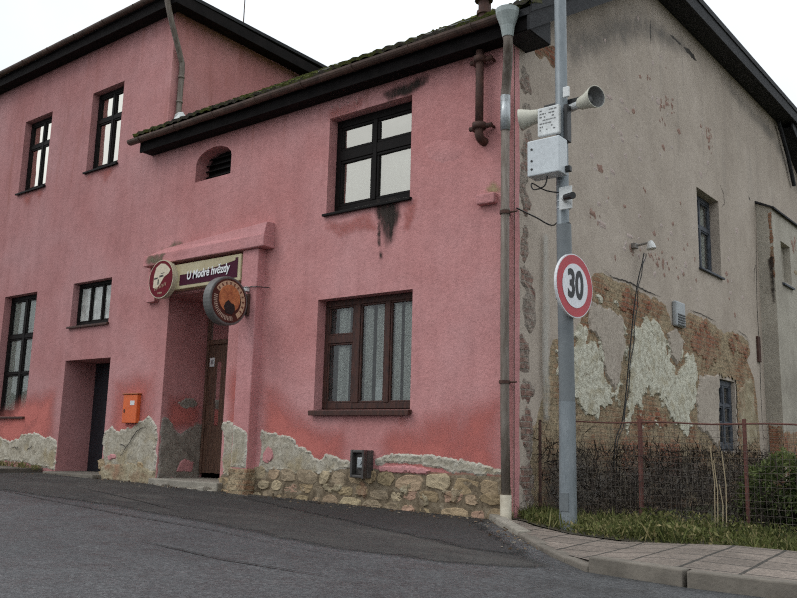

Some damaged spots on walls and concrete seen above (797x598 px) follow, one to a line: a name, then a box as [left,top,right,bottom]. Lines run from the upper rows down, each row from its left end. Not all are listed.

spalling [519,65,532,110]
leakage [365,198,398,257]
spalling [519,129,559,522]
peeling [574,273,797,515]
peeling [0,432,57,470]
peeling [102,415,202,478]
peeling [221,421,248,476]
peeling [259,429,350,474]
peeling [375,453,501,476]